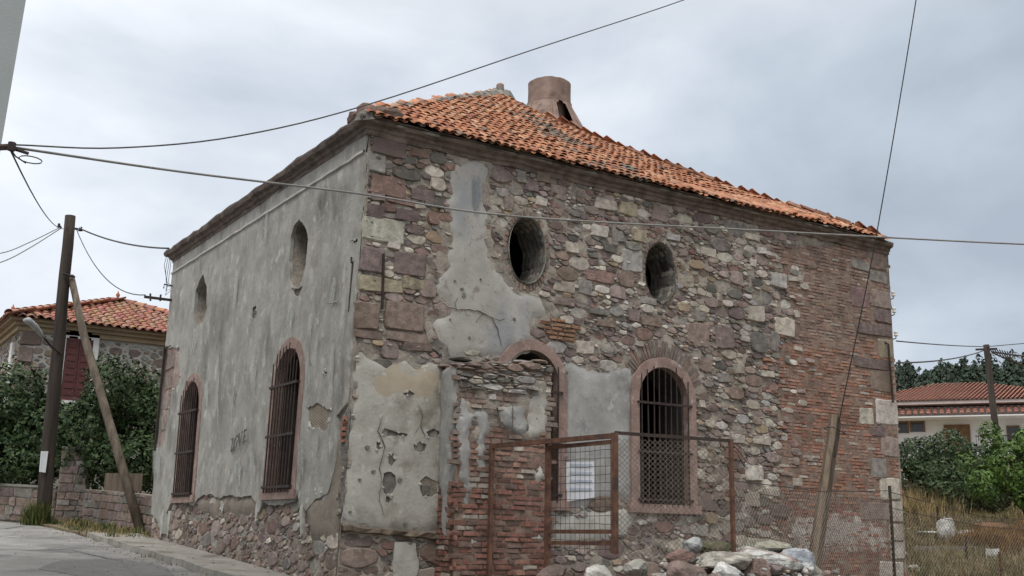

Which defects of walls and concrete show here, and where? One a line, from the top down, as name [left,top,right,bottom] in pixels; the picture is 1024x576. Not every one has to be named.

crack [439,298,505,346]
flaking render [308,403,402,514]
spalling [365,429,439,453]
spalling [418,476,439,497]